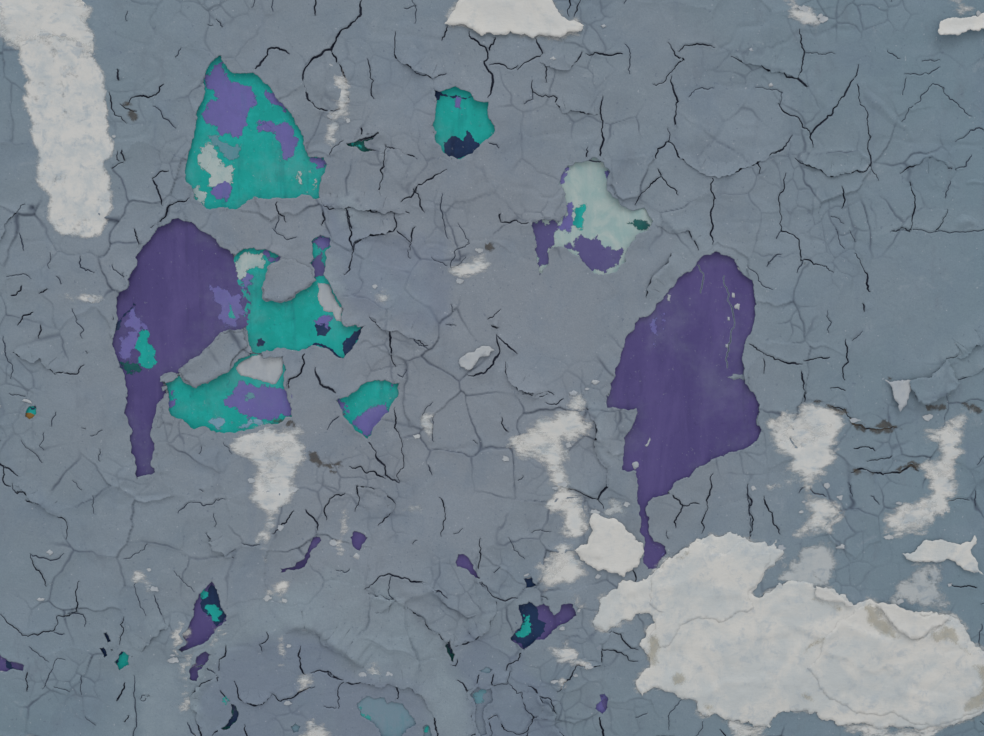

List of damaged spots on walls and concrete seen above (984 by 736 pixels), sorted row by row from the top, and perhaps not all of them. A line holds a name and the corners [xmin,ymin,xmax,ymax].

crack [251,0,448,113]
peeling [395,47,499,163]
crack [0,202,129,398]
peeling [108,51,434,481]
crack [286,353,345,431]
crack [320,127,472,277]
peeling [528,153,765,573]
crack [440,25,984,506]
peeling [0,651,28,676]
peeling [96,579,231,736]
crack [176,401,640,736]
peeling [507,573,580,654]